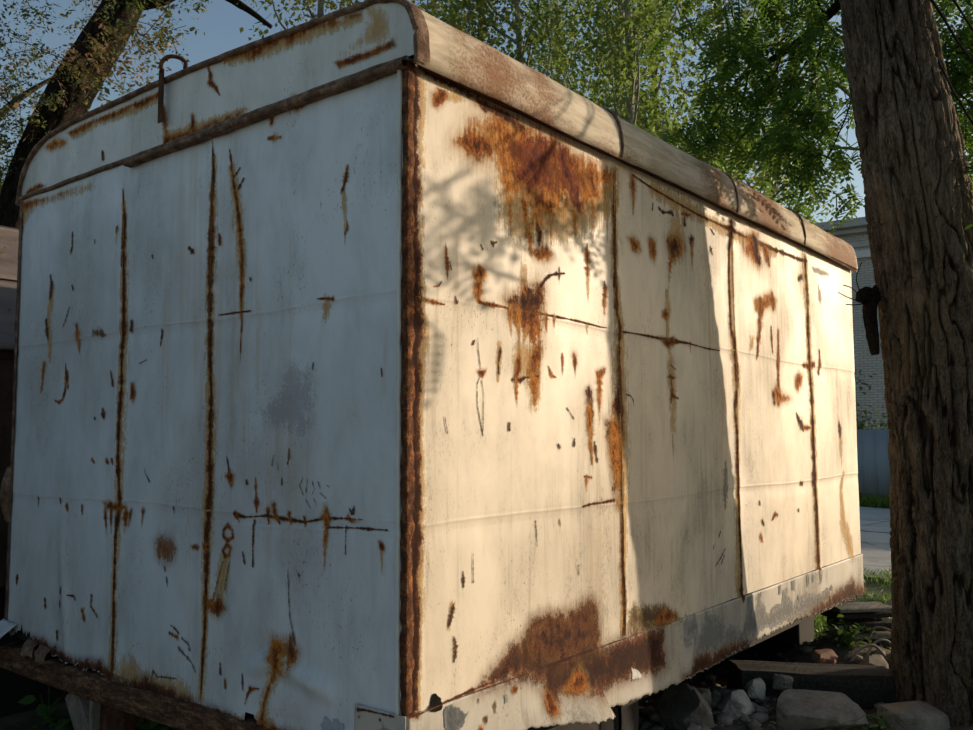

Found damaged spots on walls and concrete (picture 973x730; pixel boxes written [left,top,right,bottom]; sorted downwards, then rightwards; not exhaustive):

corrosion [224,7,395,69]
corrosion [207,67,220,96]
corrosion [45,92,247,151]
corrosion [405,67,821,719]
corrosion [21,142,388,730]
peeling [444,704,469,730]